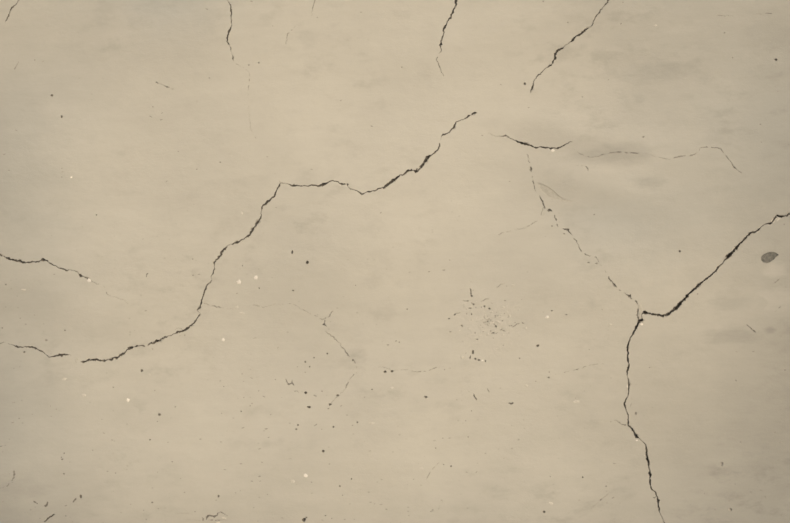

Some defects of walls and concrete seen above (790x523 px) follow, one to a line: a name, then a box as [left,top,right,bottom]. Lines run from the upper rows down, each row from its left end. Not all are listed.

crack [226,0,260,138]
crack [436,0,458,76]
crack [524,0,609,93]
crack [0,112,477,363]
crack [255,303,357,406]
crack [490,133,790,523]